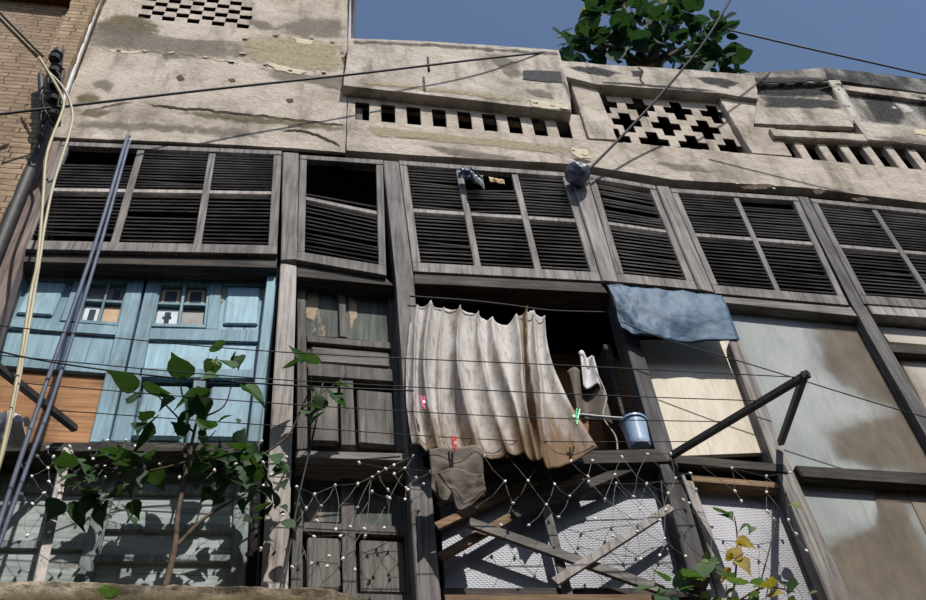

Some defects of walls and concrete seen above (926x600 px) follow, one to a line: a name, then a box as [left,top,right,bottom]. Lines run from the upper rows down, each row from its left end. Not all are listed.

damp [90,23,243,58]
flaking render [187,34,347,74]
damp [250,18,343,37]
damp [95,80,113,90]
damp [273,70,344,90]
peeling [306,293,319,321]
peeling [347,297,357,329]
damp [821,322,898,404]
damp [835,414,926,473]